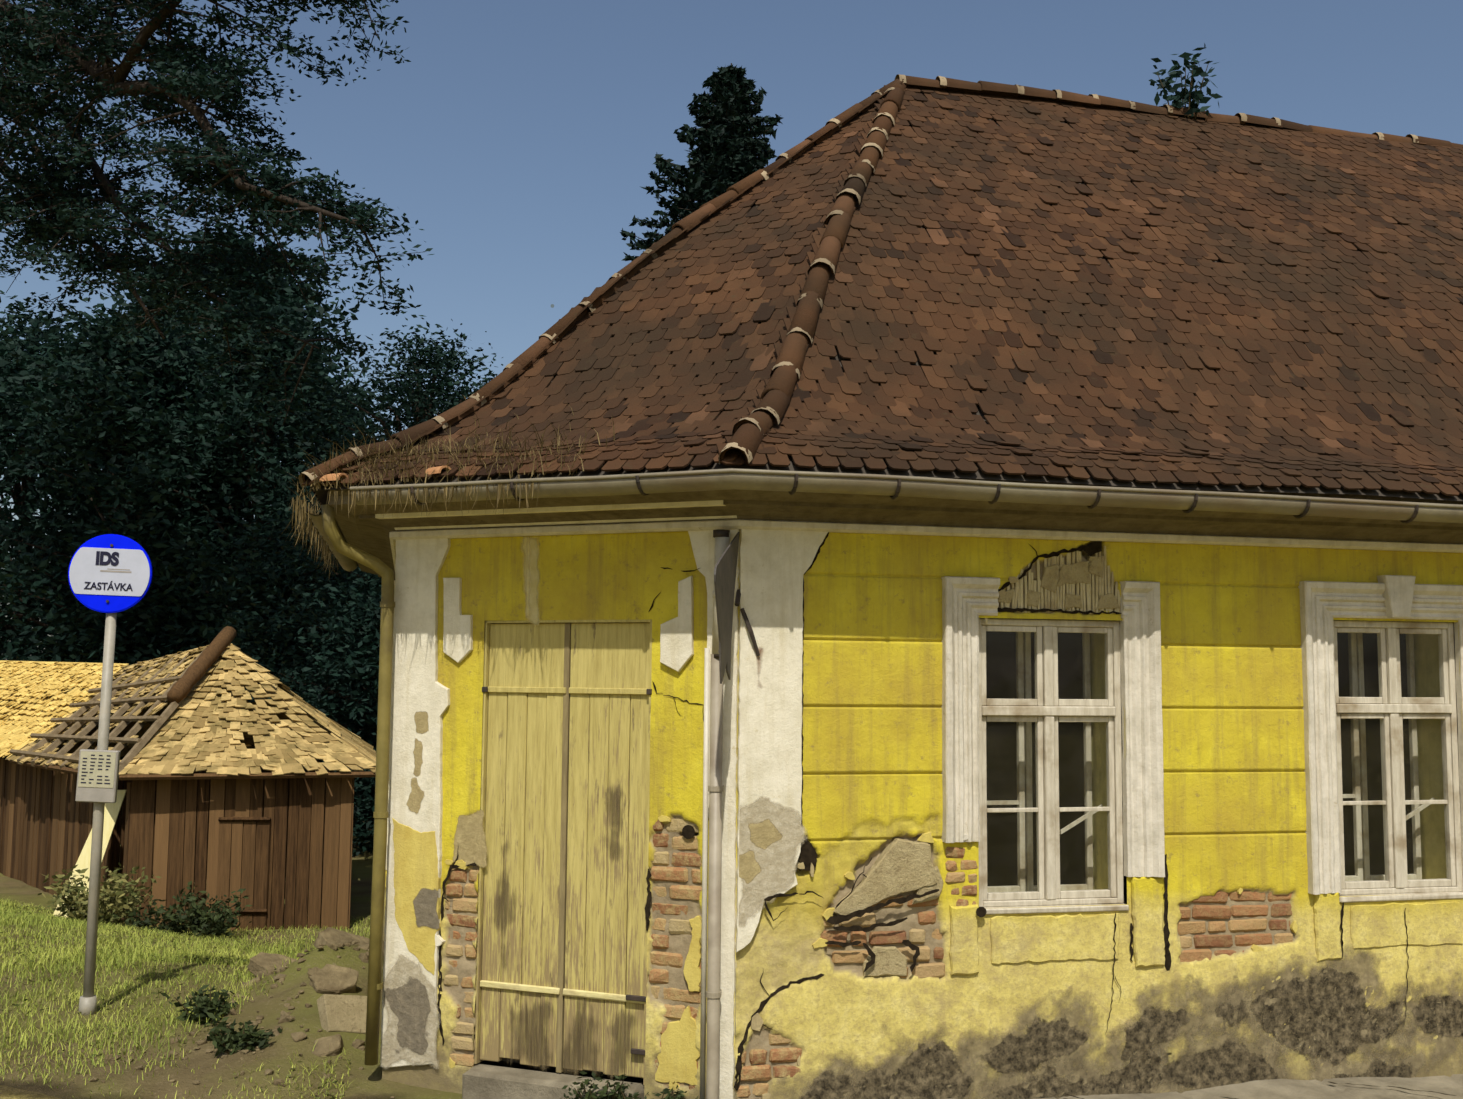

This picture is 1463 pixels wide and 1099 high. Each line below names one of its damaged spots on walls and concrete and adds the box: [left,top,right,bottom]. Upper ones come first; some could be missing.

flaking render [984,541,1121,623]
peeling [392,711,487,1068]
flaking render [649,815,702,1090]
peeling [738,797,818,925]
flaking render [812,832,987,978]
flaking render [1177,888,1298,962]
flaking render [737,1013,802,1099]
crack [734,973,824,1091]
water stain [800,949,1463,1099]